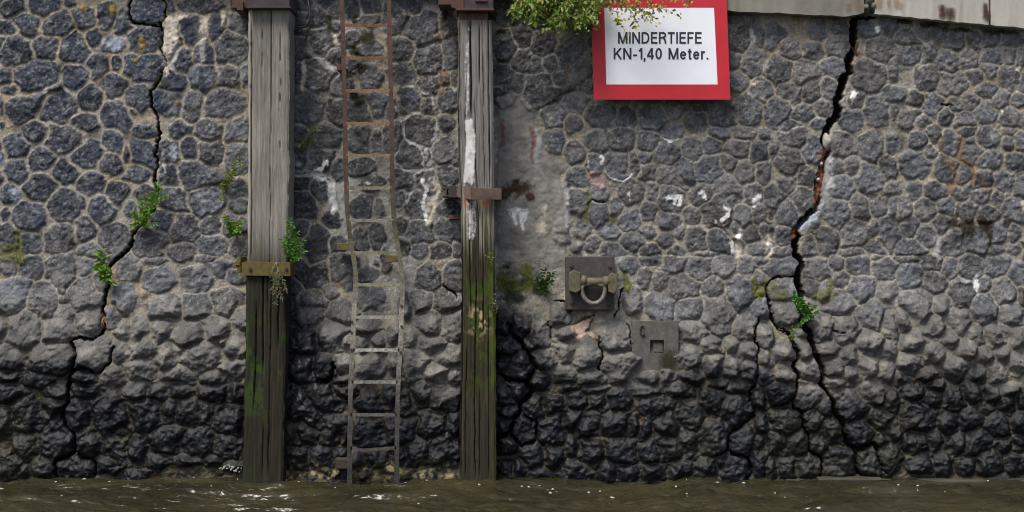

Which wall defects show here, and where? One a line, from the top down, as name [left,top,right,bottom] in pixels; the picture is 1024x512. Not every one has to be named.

crack [53,0,167,478]
rust [502,179,535,201]
spalling [571,314,601,341]
crack [727,16,886,480]